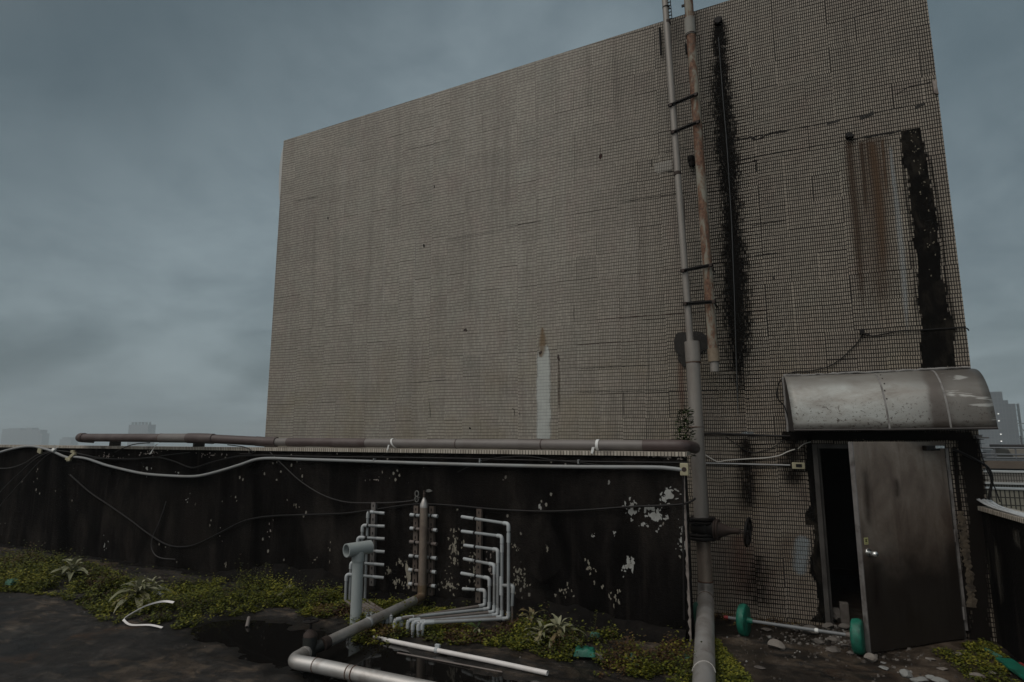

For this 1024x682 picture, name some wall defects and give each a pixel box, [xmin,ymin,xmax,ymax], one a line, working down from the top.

damp [698,19,776,402]
peeling [585,556,635,607]
peeling [623,486,685,551]
spalling [805,433,826,623]